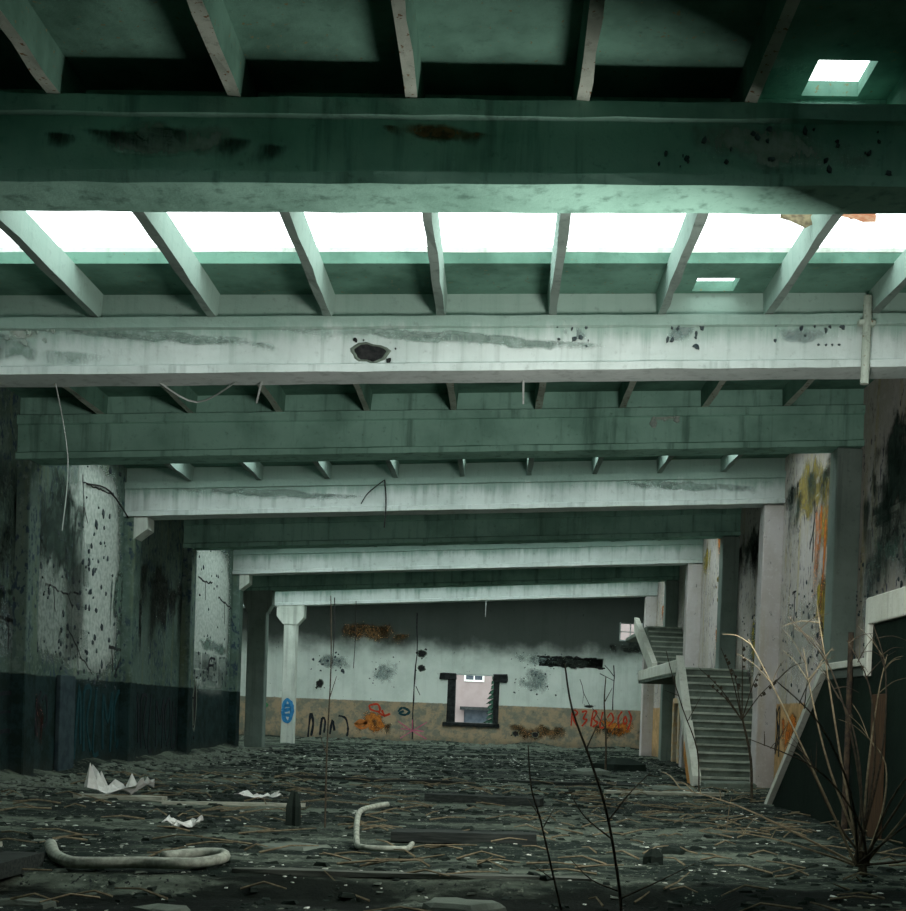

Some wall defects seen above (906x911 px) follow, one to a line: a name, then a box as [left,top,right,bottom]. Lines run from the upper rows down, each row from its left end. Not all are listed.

corrosion [408,125,483,140]
spalling [350,338,396,363]
leakage [40,470,84,583]
leakage [864,414,906,571]